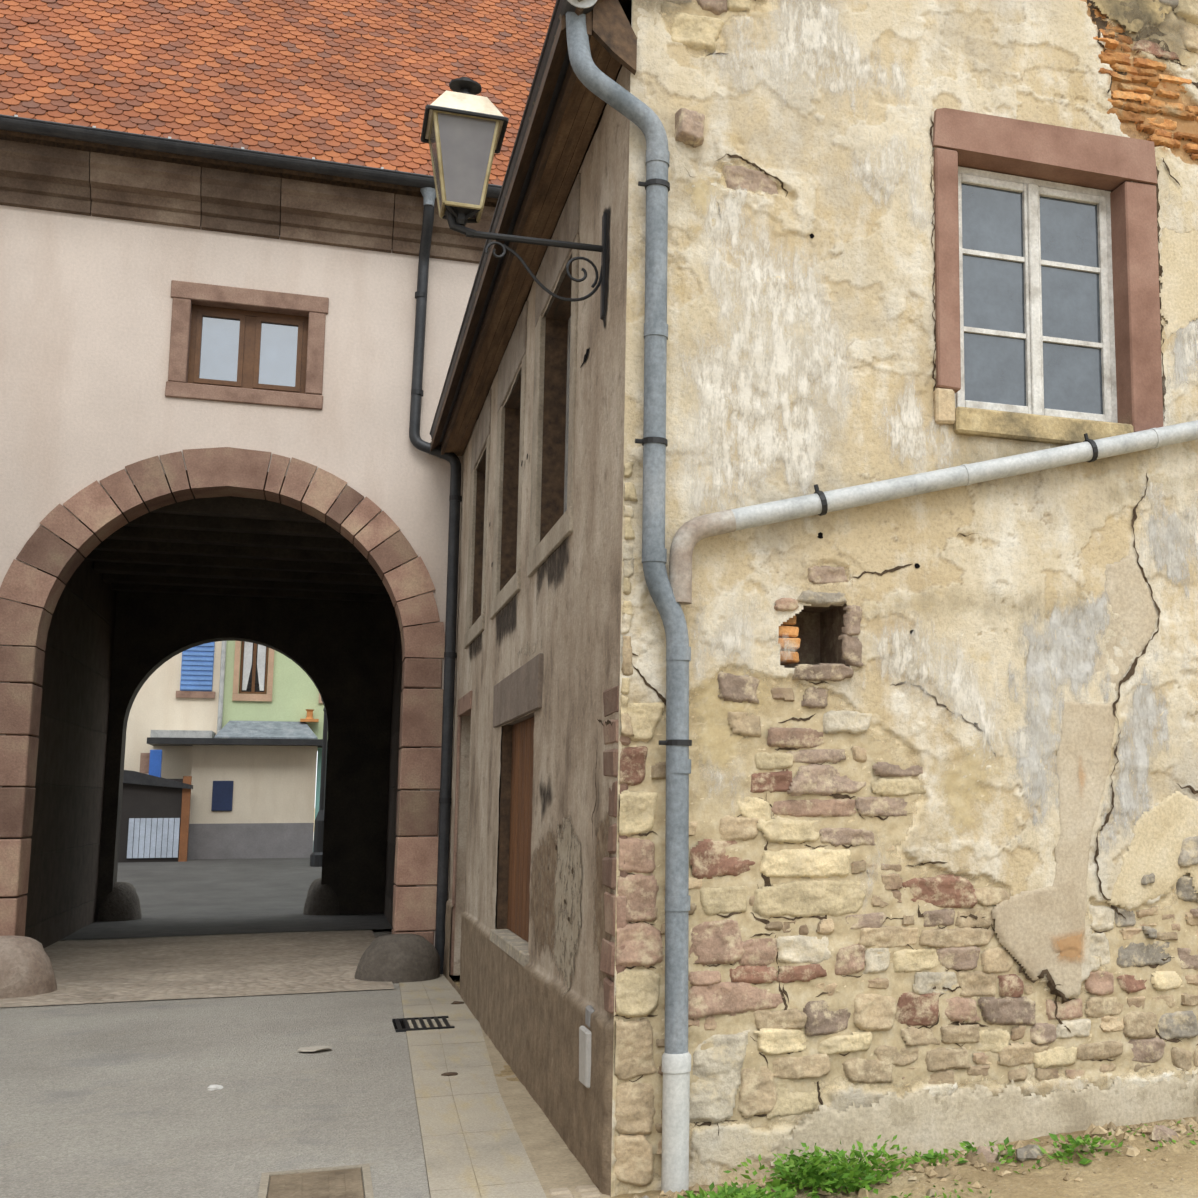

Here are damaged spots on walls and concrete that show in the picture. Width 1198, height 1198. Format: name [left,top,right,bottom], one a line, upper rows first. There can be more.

spalling [1085,0,1198,160]
spalling [530,462,666,1196]
peeling [682,160,852,511]
crack [855,564,912,579]
peeling [884,384,953,470]
spalling [688,560,1198,1135]
crack [1094,473,1161,919]
crack [1178,784,1198,794]